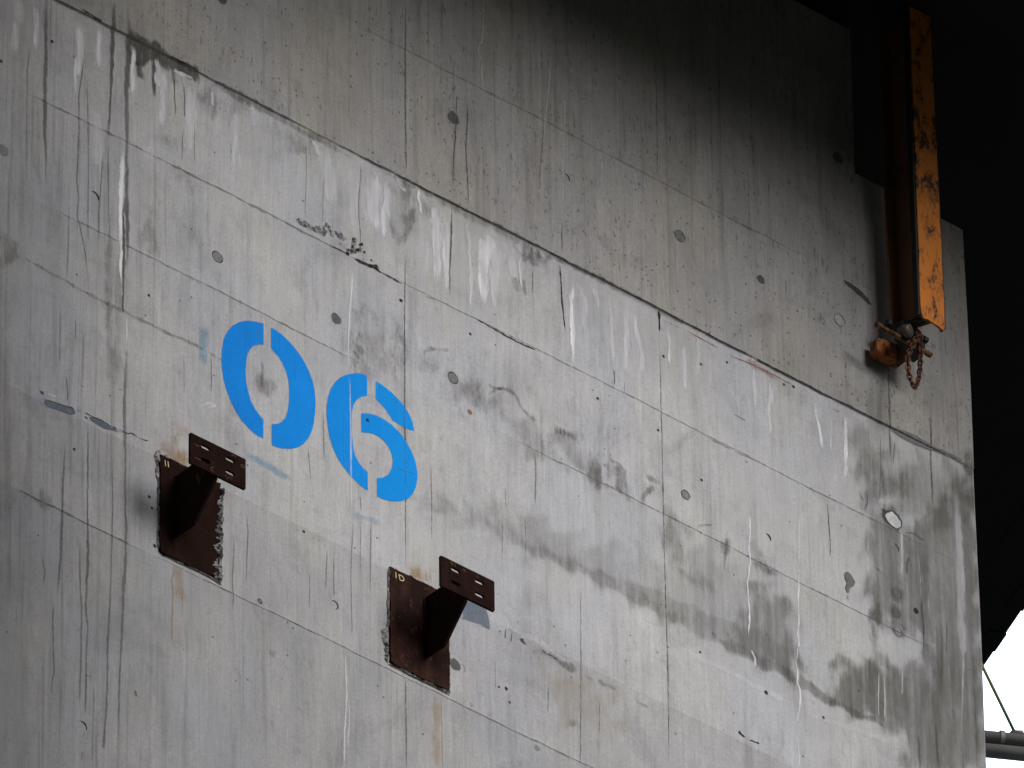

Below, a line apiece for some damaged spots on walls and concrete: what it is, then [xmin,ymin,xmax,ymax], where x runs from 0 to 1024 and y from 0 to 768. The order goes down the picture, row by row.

efflorescence [73,29,82,82]
leakage [97,12,199,135]
leakage [453,99,469,200]
leakage [118,156,130,352]
leakage [357,175,453,288]
efflorescence [468,234,522,306]
spalling [882,508,902,530]
leakage [843,471,981,768]